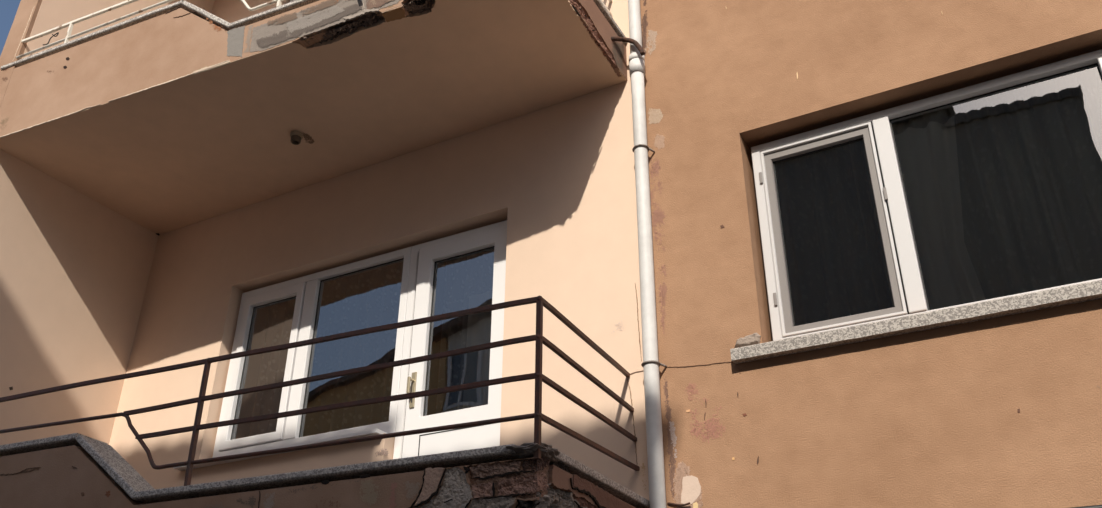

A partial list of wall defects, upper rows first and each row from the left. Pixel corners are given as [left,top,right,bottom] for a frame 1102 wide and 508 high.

spalling [301,0,435,44]
flaking render [569,0,616,67]
peeling [415,467,445,506]
crack [409,466,535,508]
flaking render [469,460,633,508]
crack [570,478,606,508]
peeling [669,422,703,508]